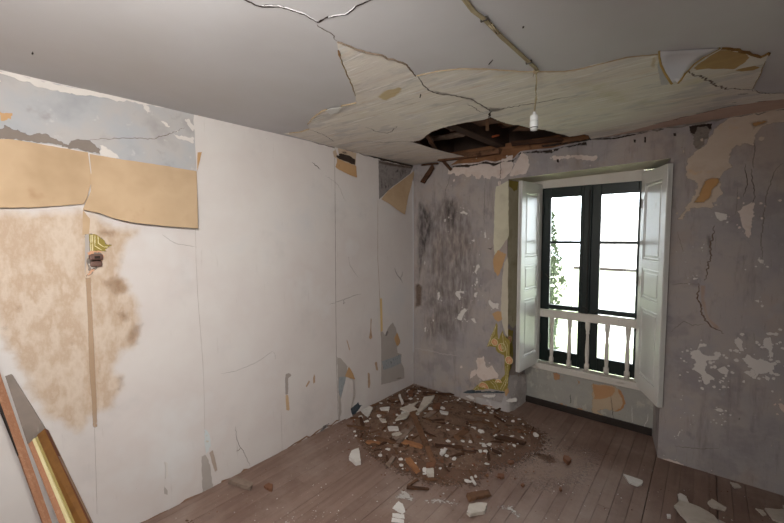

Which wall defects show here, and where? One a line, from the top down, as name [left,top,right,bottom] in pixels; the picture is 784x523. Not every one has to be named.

crack [245,0,371,41]
peeling [0,71,202,228]
peeling [284,41,784,337]
water stain [0,204,147,440]
peeling [380,298,404,385]
mould [414,181,493,355]
spalling [460,356,499,381]
crack [671,227,725,334]
spalling [679,328,784,390]